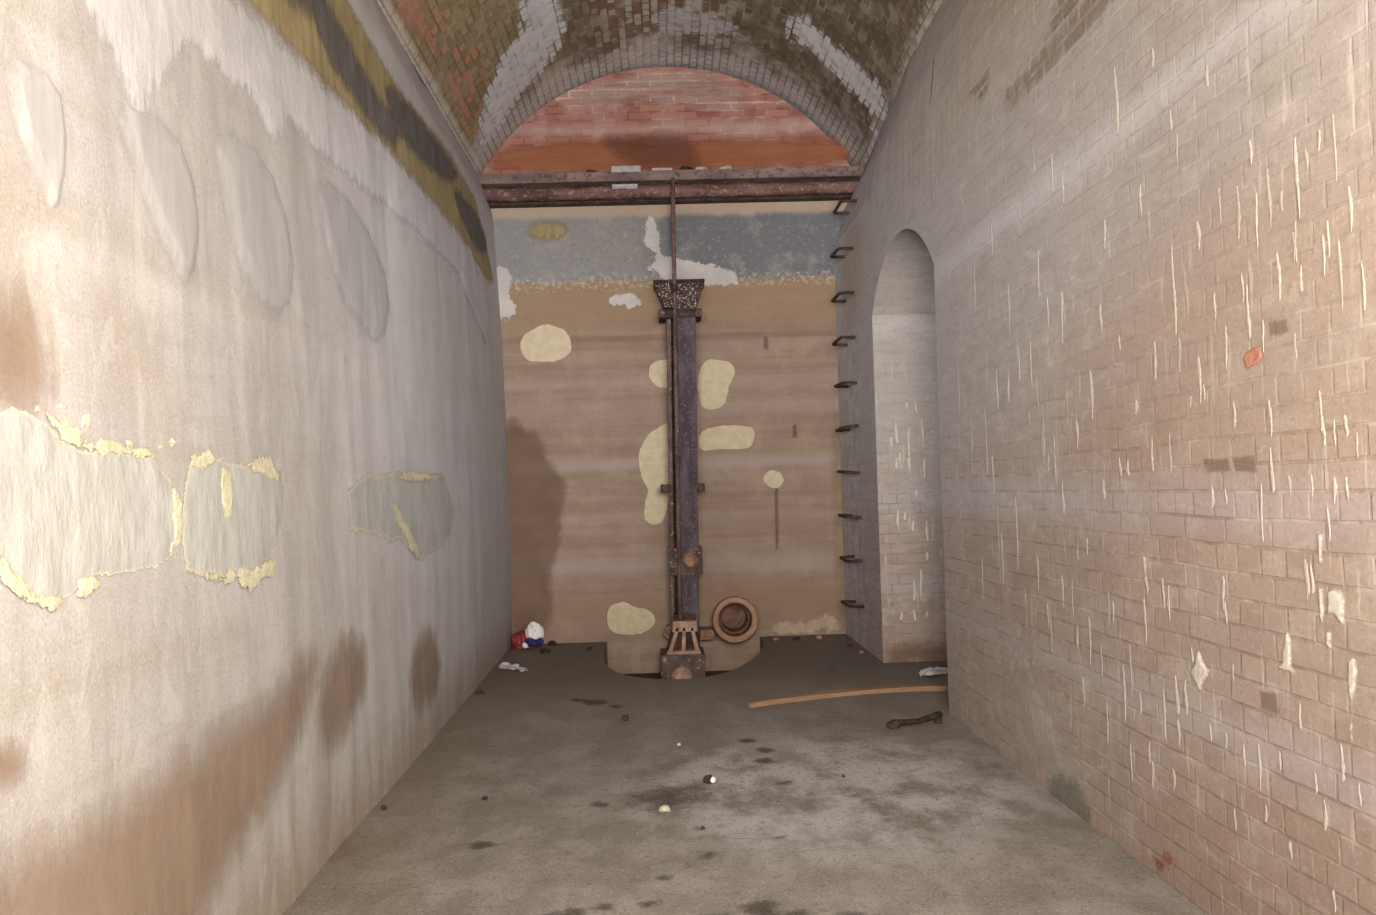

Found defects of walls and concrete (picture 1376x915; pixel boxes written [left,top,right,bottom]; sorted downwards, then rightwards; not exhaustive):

damp [1218,114,1353,308]
peeling [520,324,572,362]
damp [1171,245,1206,408]
damp [1241,273,1264,353]
peeling [0,403,284,612]
damp [507,426,563,633]
peeling [638,423,669,525]
damp [1260,400,1291,542]
damp [1319,391,1358,458]
peeling [607,602,656,635]
damp [1303,559,1322,622]
damp [1130,676,1188,789]